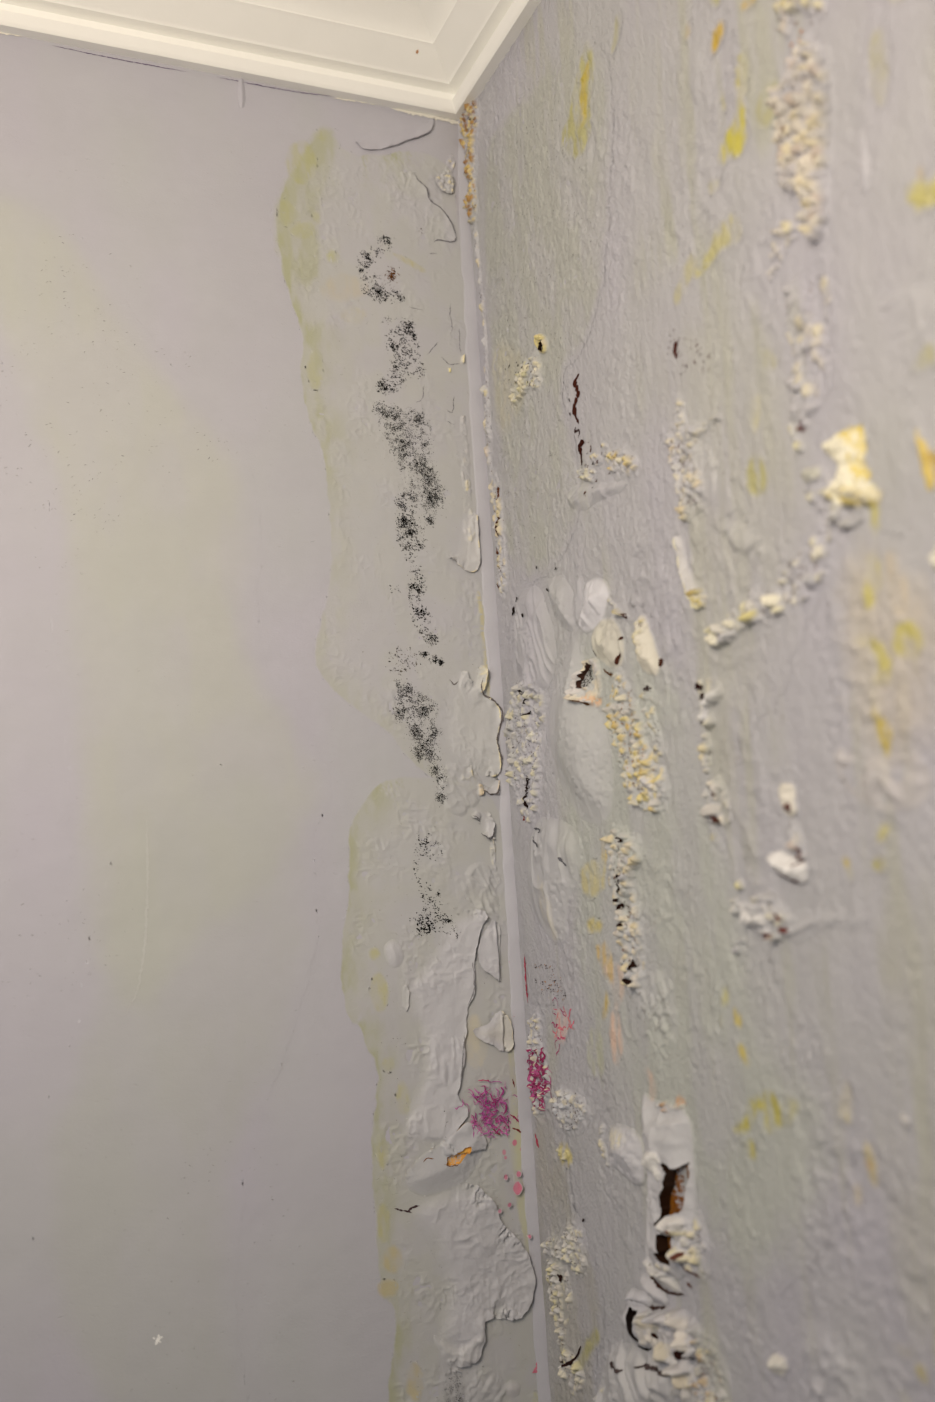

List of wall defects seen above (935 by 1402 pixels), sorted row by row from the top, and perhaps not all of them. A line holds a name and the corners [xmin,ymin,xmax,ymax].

peeling [449,415,480,572]
damp [0,184,332,1402]
peeling [439,665,503,886]
damp [270,0,935,1402]
peeling [395,909,514,1148]